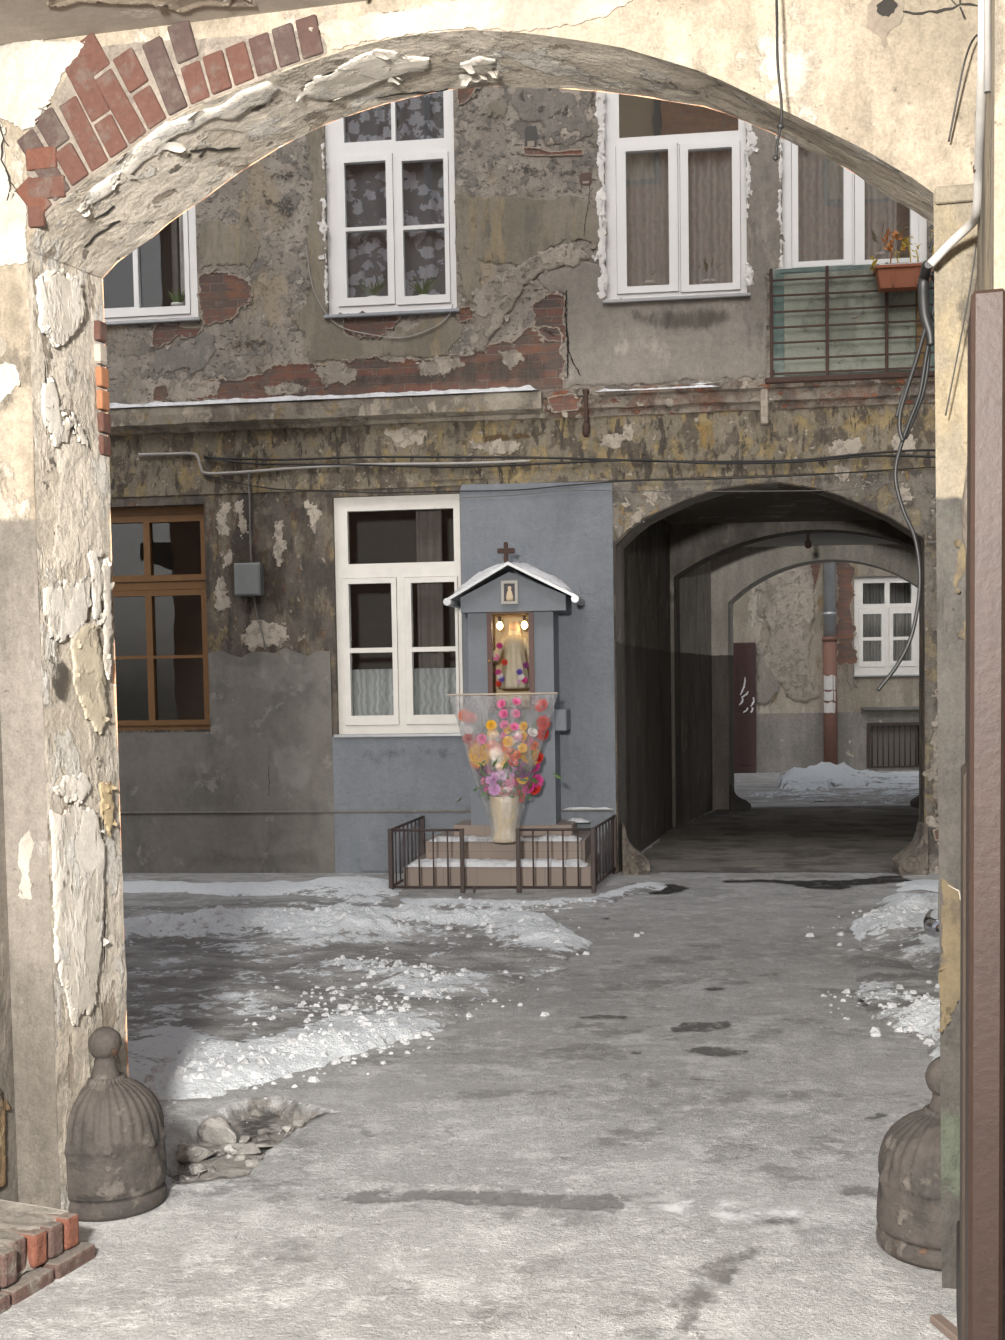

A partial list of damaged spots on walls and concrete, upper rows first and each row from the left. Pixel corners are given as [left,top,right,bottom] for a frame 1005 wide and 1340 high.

crack [0,125,16,201]
flaking render [0,0,633,267]
flaking render [150,125,785,418]
peeling [0,362,20,403]
peeling [35,268,111,457]
leakage [482,433,539,442]
peeling [214,499,249,617]
leakage [229,547,285,601]
peeling [43,548,115,734]
peeling [240,620,290,651]
peeling [17,829,35,900]
peeling [49,773,117,1026]